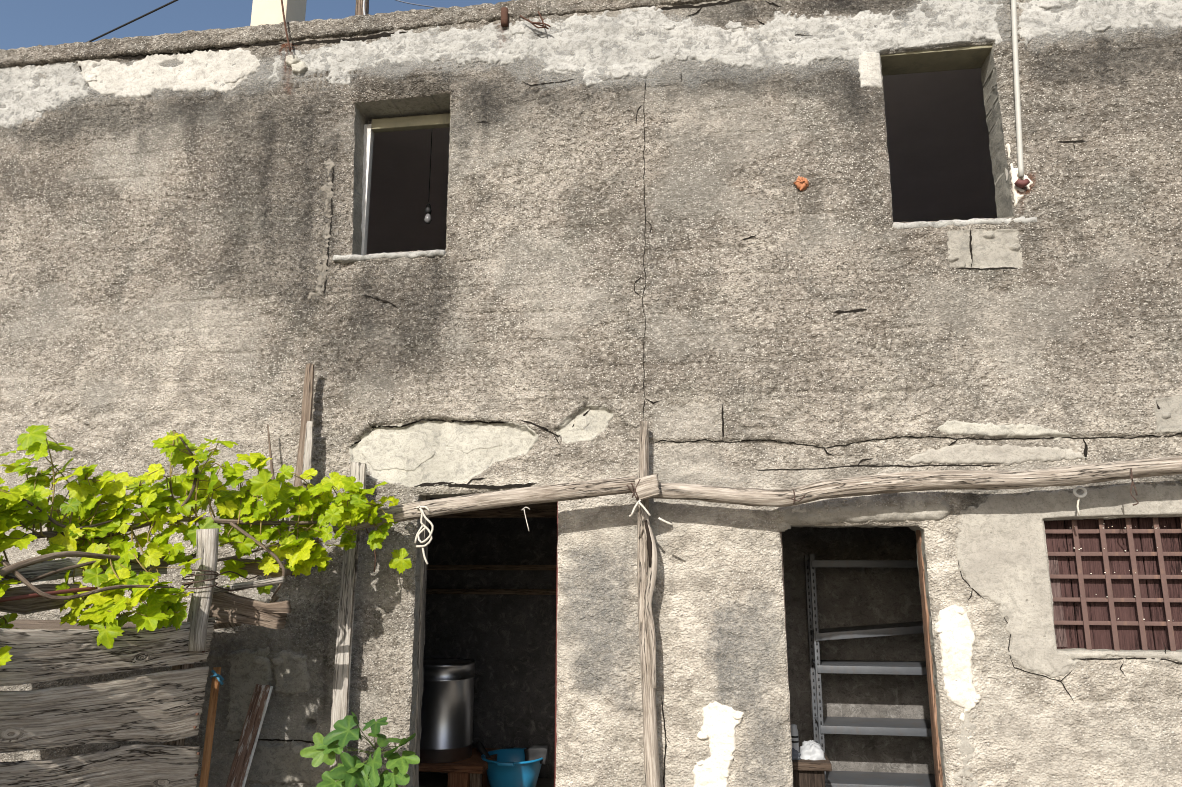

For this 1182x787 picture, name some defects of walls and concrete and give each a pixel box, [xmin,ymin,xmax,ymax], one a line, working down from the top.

peeling [0,0,1182,129]
crack [634,83,1182,471]
spalling [349,420,539,487]
spalling [555,404,614,444]
crack [958,562,1182,700]
crack [661,697,669,787]